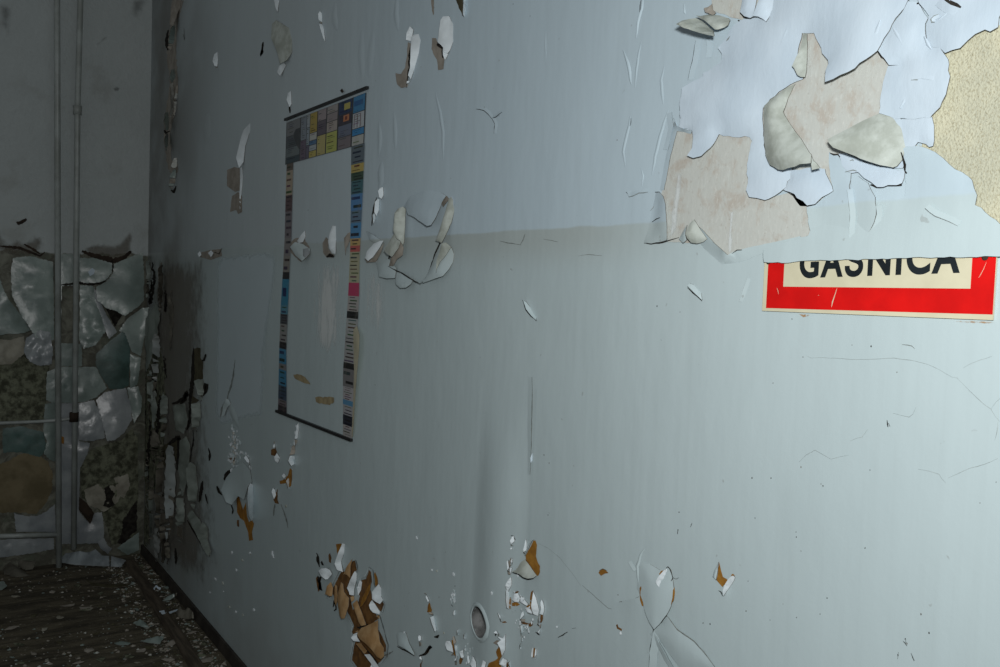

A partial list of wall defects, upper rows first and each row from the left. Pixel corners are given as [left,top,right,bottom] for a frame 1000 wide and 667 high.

peeling [396,0,453,88]
peeling [227,124,250,214]
peeling [365,162,454,288]
peeling [644,0,1000,264]
peeling [0,252,211,570]
water stain [159,268,200,478]
water stain [159,459,201,562]
peeling [216,424,254,554]
peeling [271,423,299,527]
peeling [316,535,544,667]
crack [542,545,715,667]
peeling [713,562,735,596]